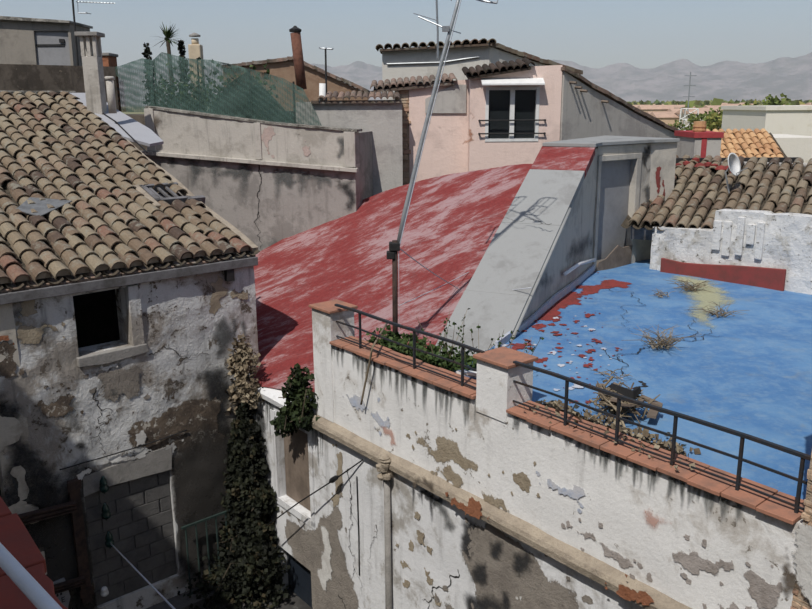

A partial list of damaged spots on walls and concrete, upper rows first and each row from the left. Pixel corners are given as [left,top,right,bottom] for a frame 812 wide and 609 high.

crack [254,165,262,247]
peeling [502,271,632,391]
water stain [353,353,476,409]
crack [89,387,109,458]
peeling [108,395,233,463]
water stain [172,369,232,576]
water stain [565,436,661,479]
water stain [3,439,102,609]
peeling [406,431,654,609]
crack [424,572,460,608]
peeling [672,534,734,586]
peeling [718,562,783,609]